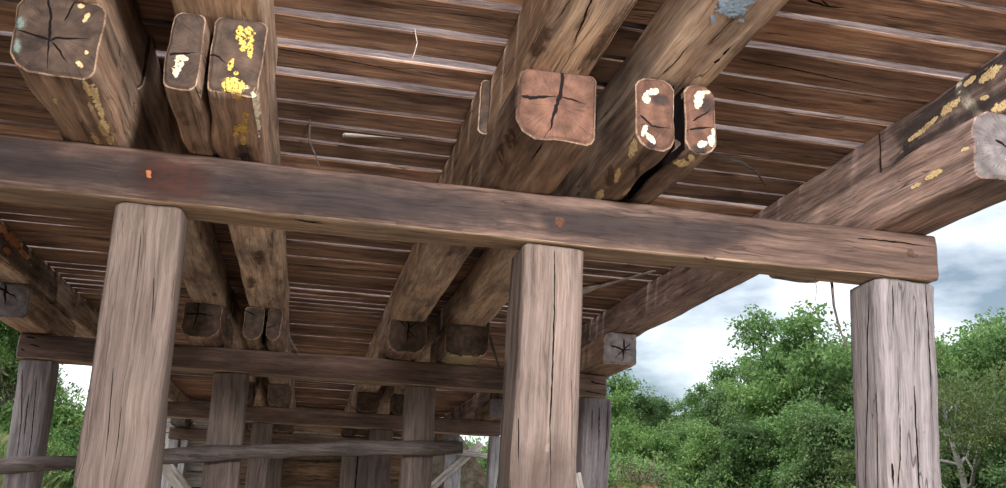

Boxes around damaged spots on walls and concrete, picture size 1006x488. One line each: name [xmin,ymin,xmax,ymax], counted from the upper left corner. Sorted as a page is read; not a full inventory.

crack [19,0,86,72]
crack [522,0,592,164]
crack [628,18,890,200]
crack [549,251,608,485]
crack [610,339,633,362]